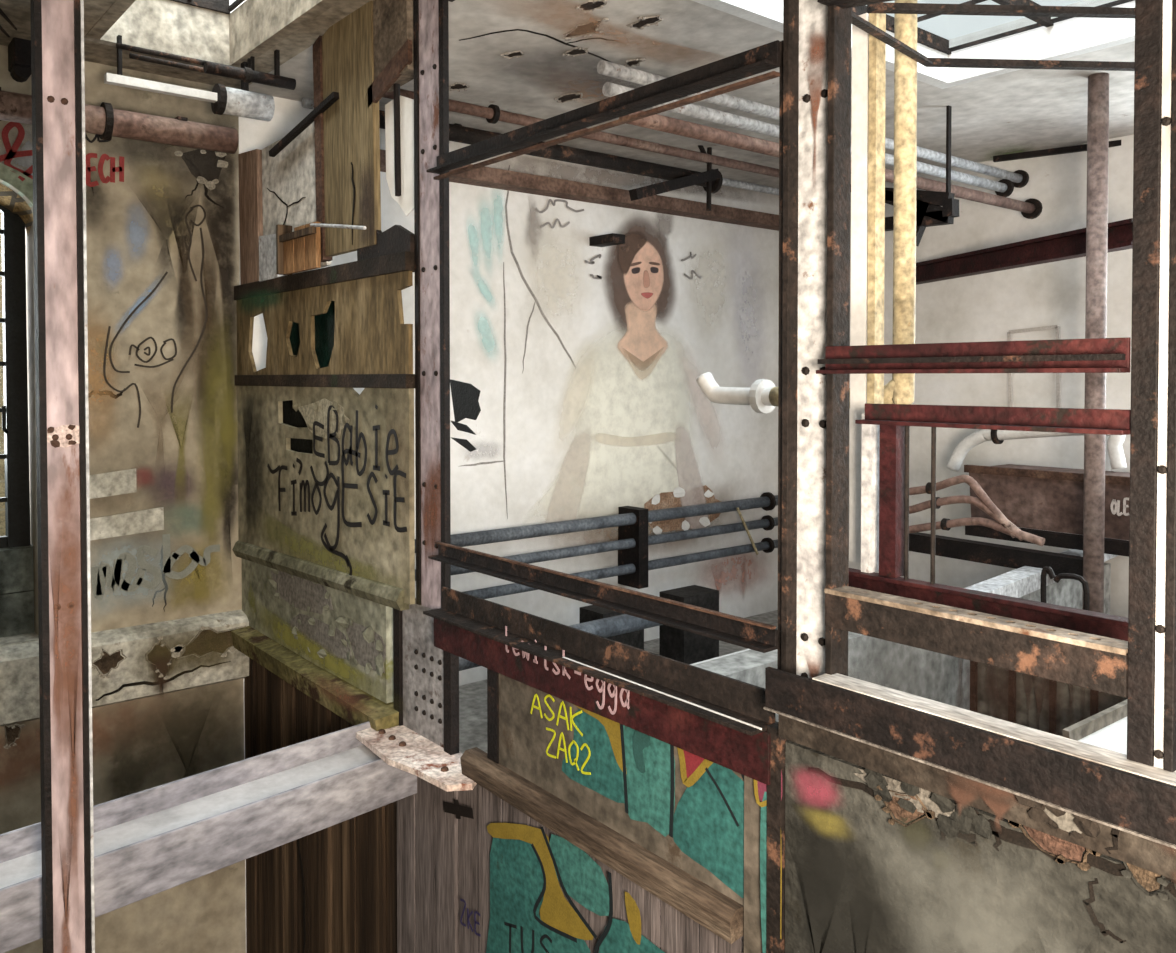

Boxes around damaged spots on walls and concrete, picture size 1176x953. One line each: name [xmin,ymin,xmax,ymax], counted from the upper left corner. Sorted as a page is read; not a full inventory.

damp [152,151,262,548]
spalling [92,649,127,679]
spalling [145,626,247,680]
rust [958,670,1098,735]
peeling [854,768,992,840]
rust [953,781,1012,823]
peeling [1008,795,1102,871]
spalling [1121,862,1170,901]